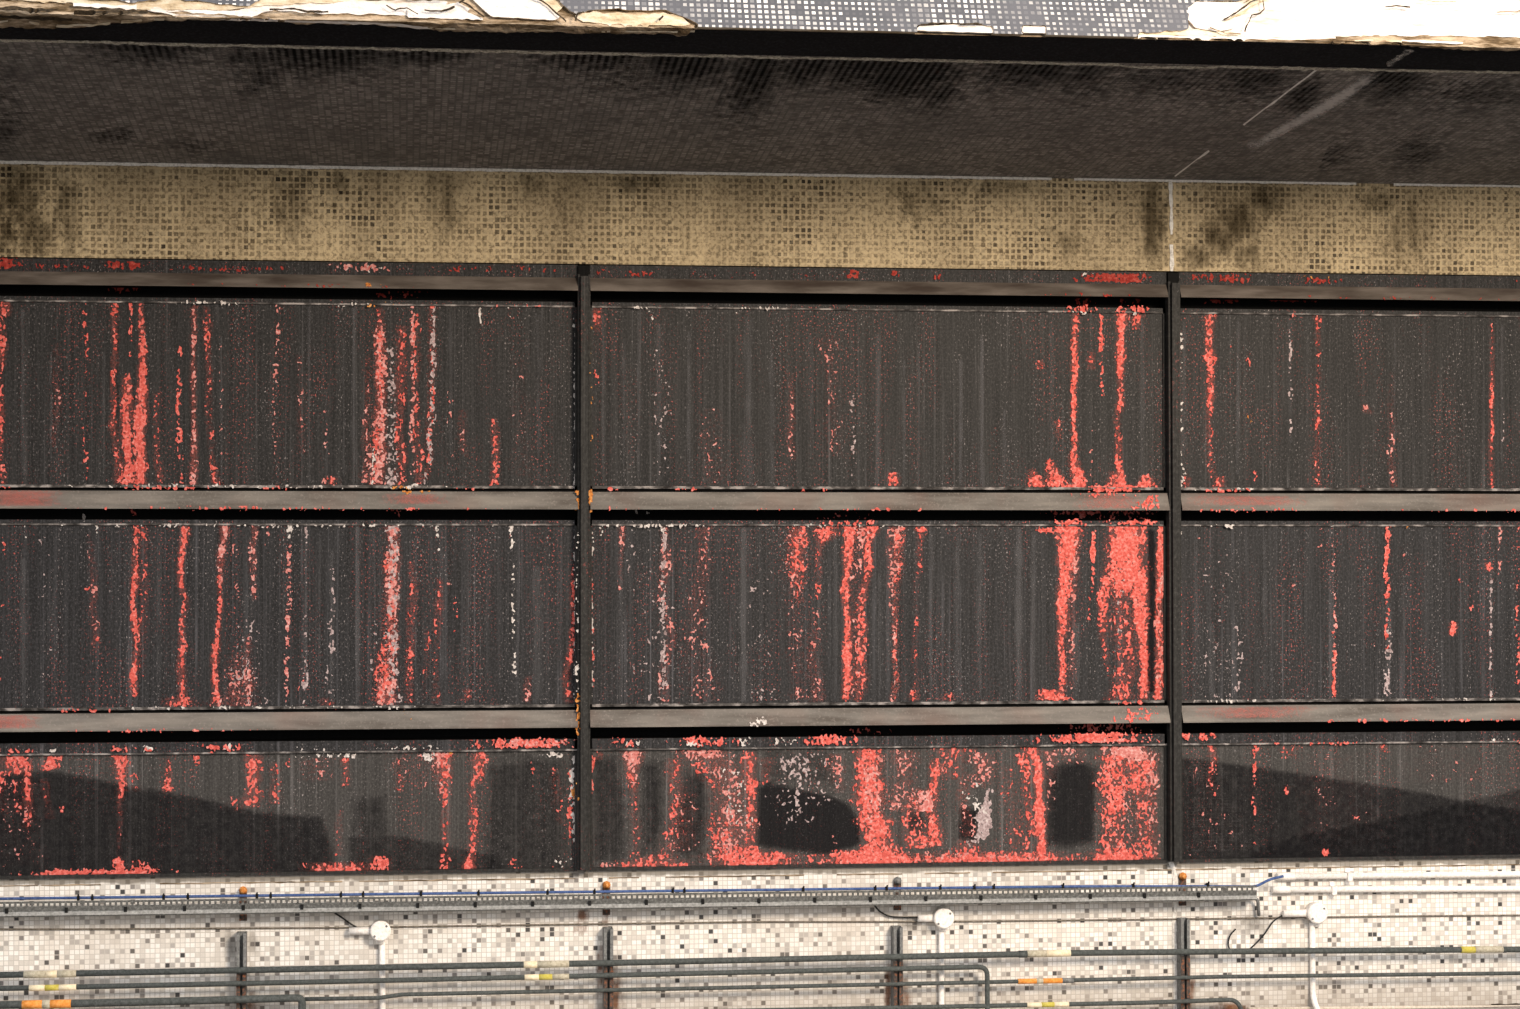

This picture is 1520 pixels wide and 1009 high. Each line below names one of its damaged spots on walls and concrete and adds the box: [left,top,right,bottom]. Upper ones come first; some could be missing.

spalling [0,0,695,37]
spalling [1137,0,1520,51]
water stain [1145,192,1164,255]
water stain [1190,190,1268,264]
peeling [1192,273,1257,513]
peeling [108,288,364,710]
peeling [393,272,1183,869]
peeling [1371,526,1405,696]
peeling [1469,508,1520,697]
peeling [0,748,194,875]
peeling [192,728,350,808]
peeling [303,830,389,871]